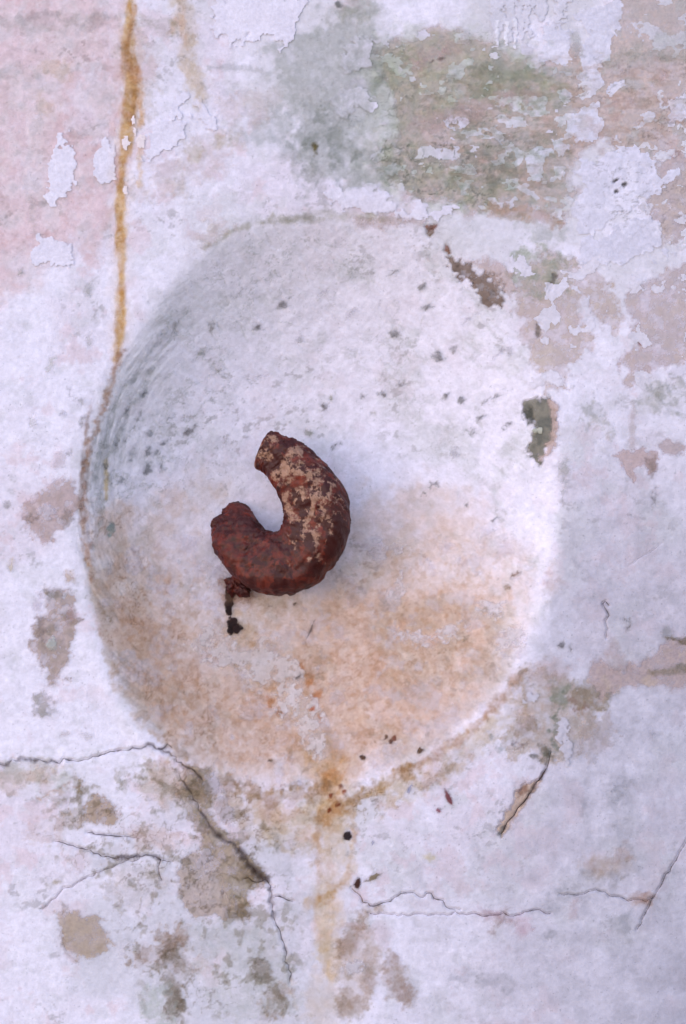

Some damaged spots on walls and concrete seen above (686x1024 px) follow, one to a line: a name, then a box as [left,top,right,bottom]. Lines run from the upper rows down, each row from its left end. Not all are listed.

peeling [43,130,77,207]
peeling [93,137,117,184]
rust [122,115,145,150]
peeling [323,0,686,351]
peeling [31,233,74,268]
spalling [523,363,574,465]
rust [224,589,243,635]
crack [0,743,292,979]
crack [352,845,685,929]